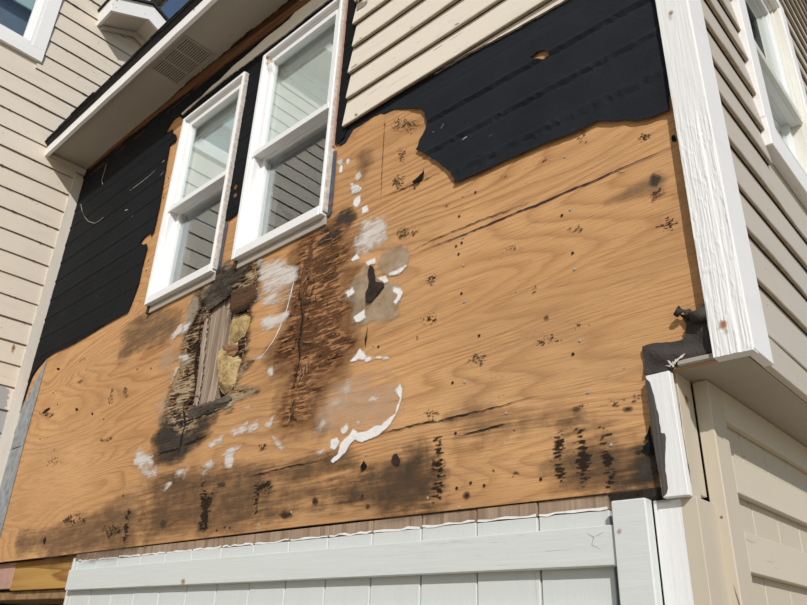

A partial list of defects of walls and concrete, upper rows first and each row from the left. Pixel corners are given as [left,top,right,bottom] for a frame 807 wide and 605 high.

crack [410,145,677,252]
damp [198,266,248,303]
damp [261,164,368,429]
crack [381,396,534,437]
damp [142,412,348,535]
damp [340,436,445,508]
damp [549,426,662,499]
damp [19,508,134,554]